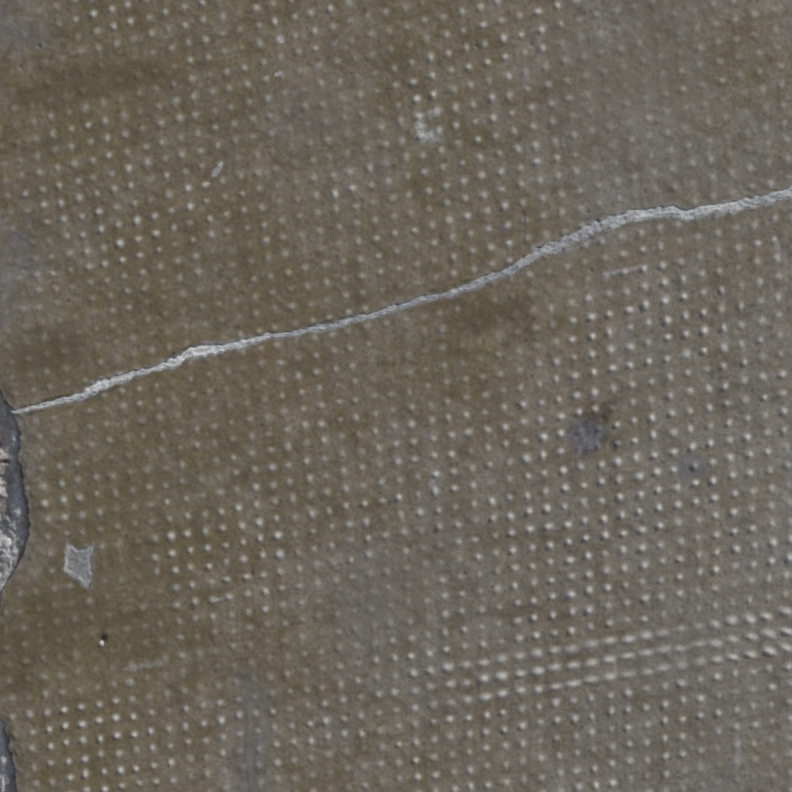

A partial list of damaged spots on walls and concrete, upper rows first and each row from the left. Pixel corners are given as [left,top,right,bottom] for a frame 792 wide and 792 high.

crack [0,184,792,414]
spalling [0,393,30,601]
spalling [0,719,16,792]